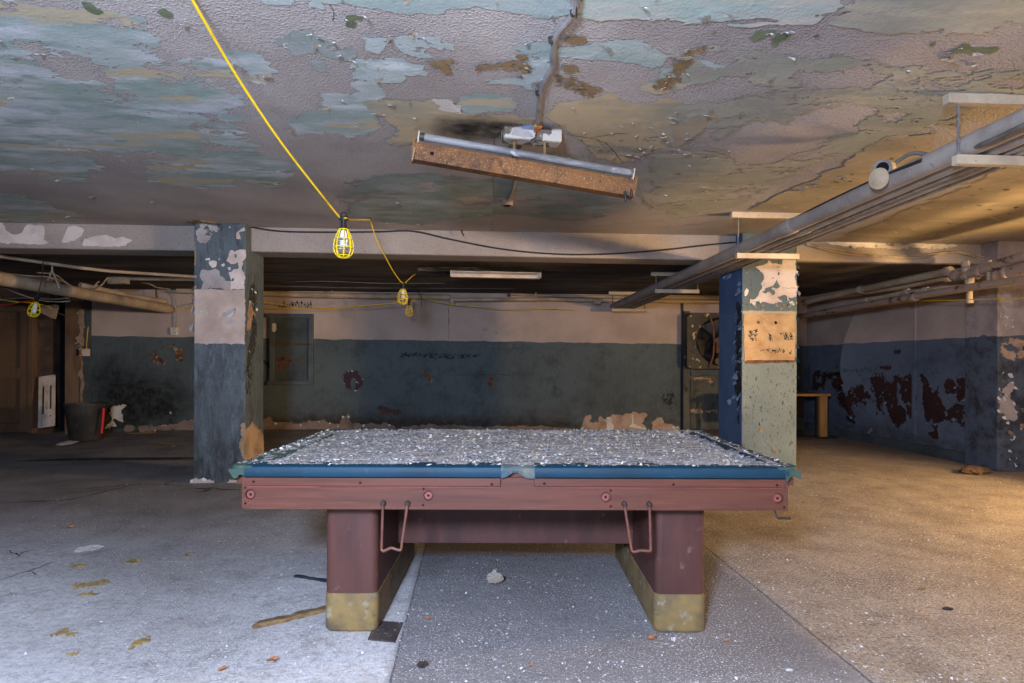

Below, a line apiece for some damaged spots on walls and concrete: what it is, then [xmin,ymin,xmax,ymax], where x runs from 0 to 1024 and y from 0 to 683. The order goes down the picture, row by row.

peeling [0,0,312,197]
peeling [276,0,1024,216]
peeling [0,193,132,247]
flaking render [151,220,258,394]
peeling [343,370,364,391]
flaking render [238,405,787,467]
flaking render [723,259,801,424]
peeling [797,350,965,440]
peeling [997,288,1024,467]